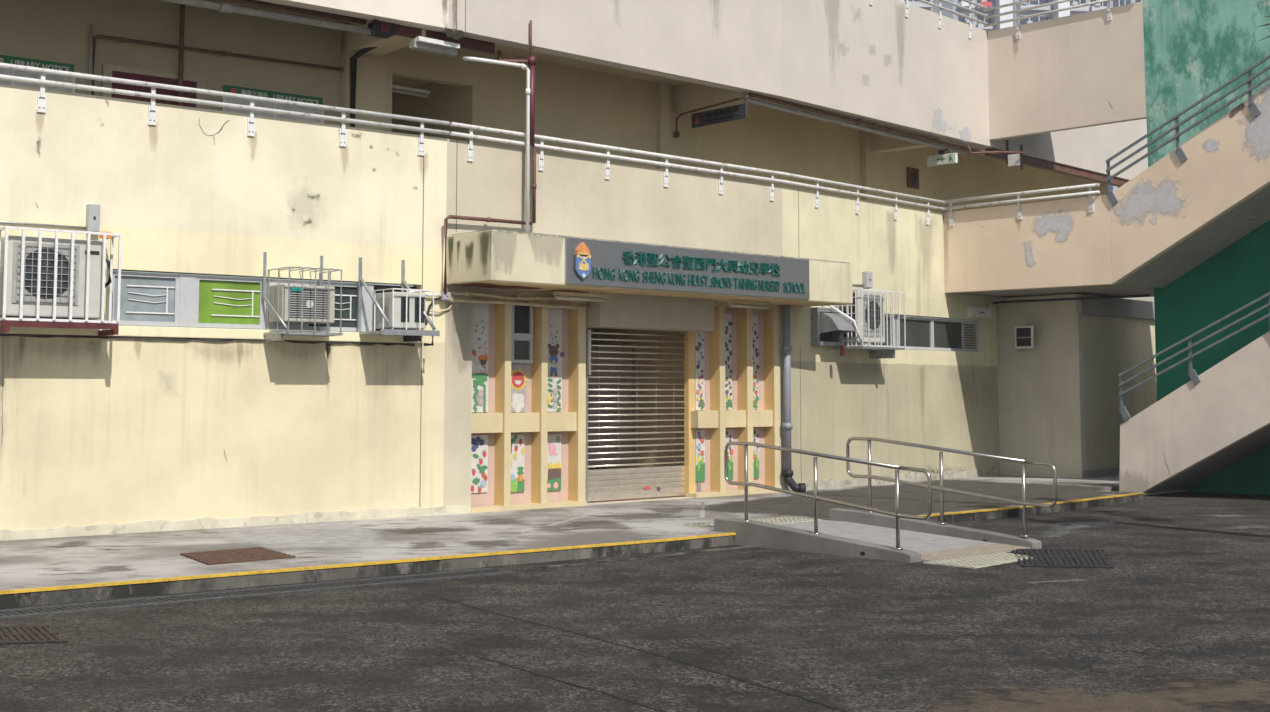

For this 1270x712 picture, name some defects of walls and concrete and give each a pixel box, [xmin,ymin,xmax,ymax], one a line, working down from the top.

peeling [1229,85,1270,160]
peeling [1113,180,1186,225]
peeling [1024,212,1074,267]